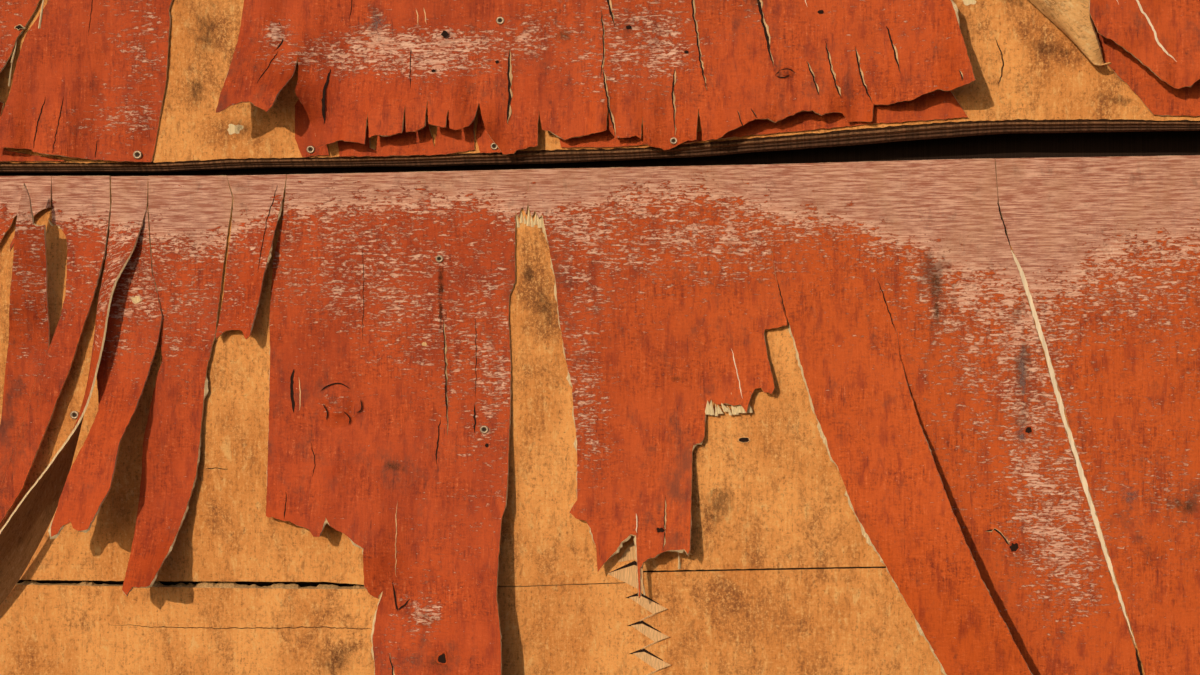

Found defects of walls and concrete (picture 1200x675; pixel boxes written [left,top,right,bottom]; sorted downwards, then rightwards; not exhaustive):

crack [986,528,1010,545]
crack [997,201,1143,675]